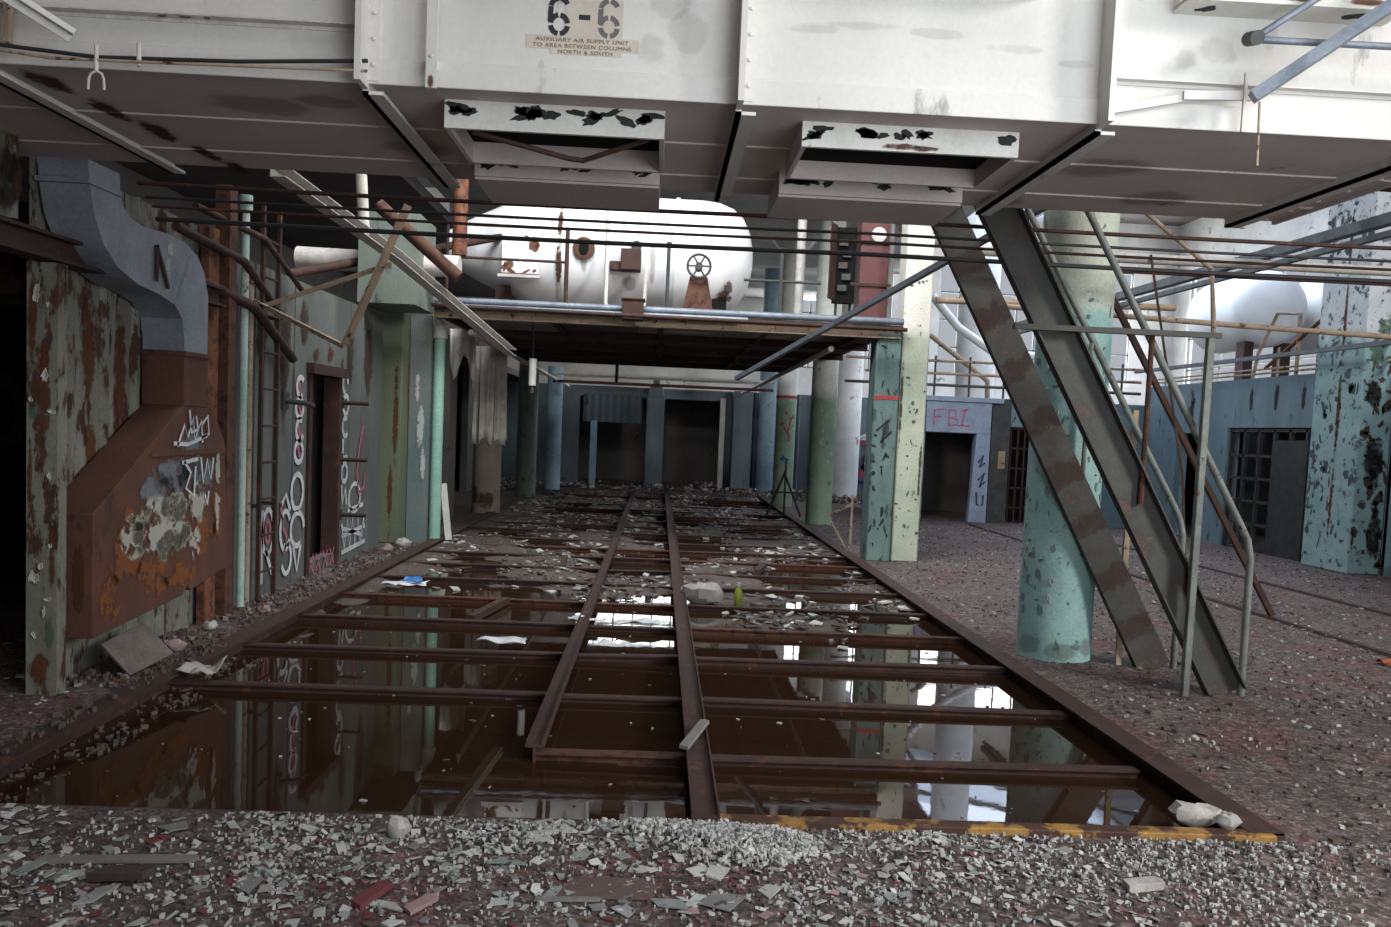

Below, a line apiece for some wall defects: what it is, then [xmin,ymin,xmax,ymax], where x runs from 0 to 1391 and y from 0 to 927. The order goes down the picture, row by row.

peeling [445,101,478,116]
peeling [510,105,665,128]
peeling [802,125,835,141]
peeling [855,127,934,141]
peeling [998,135,1017,146]
peeling [1328,201,1359,229]
rust [27,279,51,519]
peeling [1303,354,1391,570]
peeling [868,490,919,547]
rust [72,472,223,621]
rust [31,654,49,683]